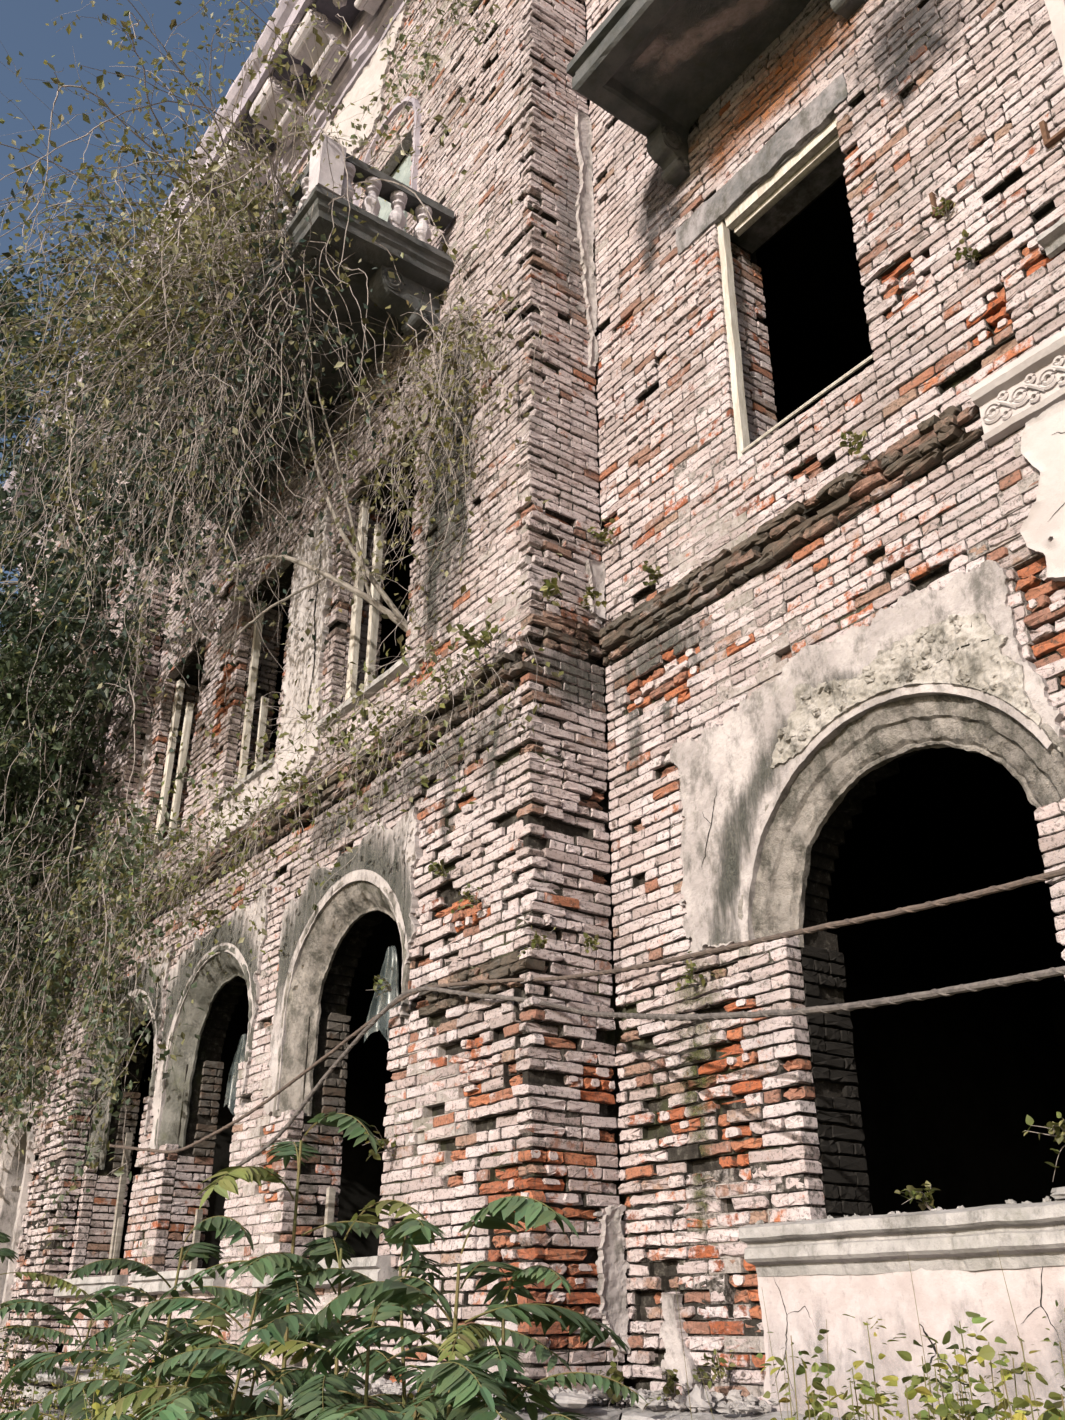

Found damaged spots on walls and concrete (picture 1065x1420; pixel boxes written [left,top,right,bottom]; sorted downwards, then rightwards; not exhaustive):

spalling [770,400,1065,768]
water stain [275,703,506,999]
water stain [712,723,786,946]
water stain [101,915,258,1054]
crack [1021,1268,1065,1350]